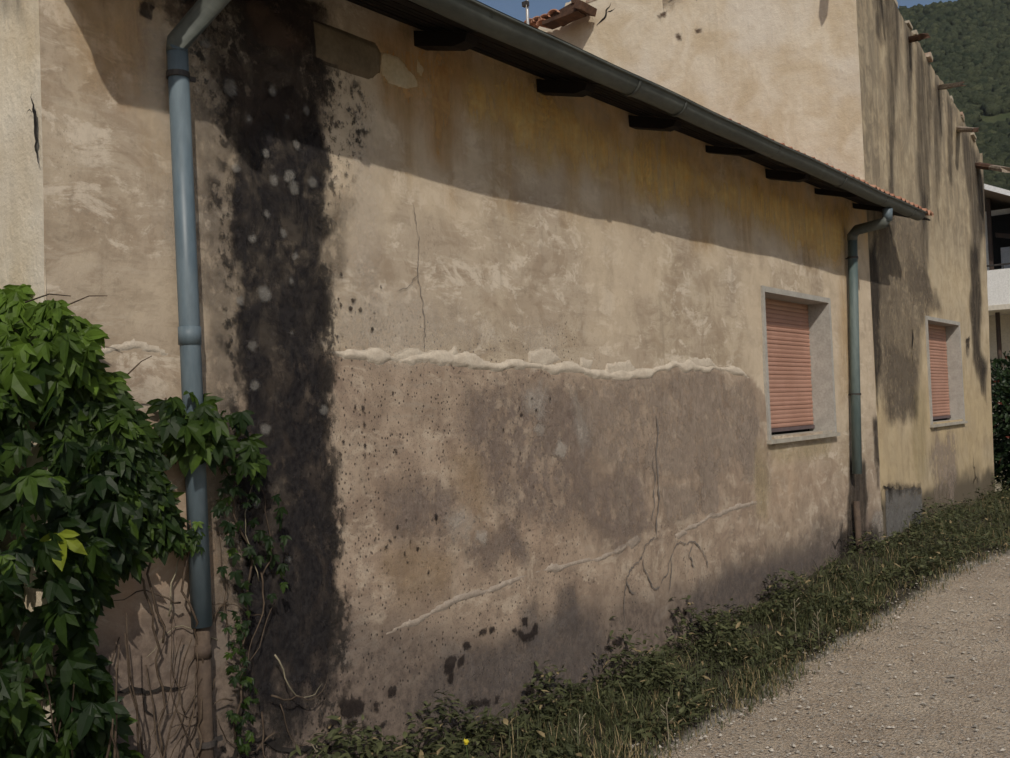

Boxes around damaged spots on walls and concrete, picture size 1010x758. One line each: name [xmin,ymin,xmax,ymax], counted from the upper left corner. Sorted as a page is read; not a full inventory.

peeling [380,51,425,89]
leakage [188,0,368,758]
crack [397,205,426,350]
leakage [466,371,759,542]
crack [623,417,708,621]
leakage [840,419,880,558]
leakage [870,0,952,415]
leakage [964,135,987,394]